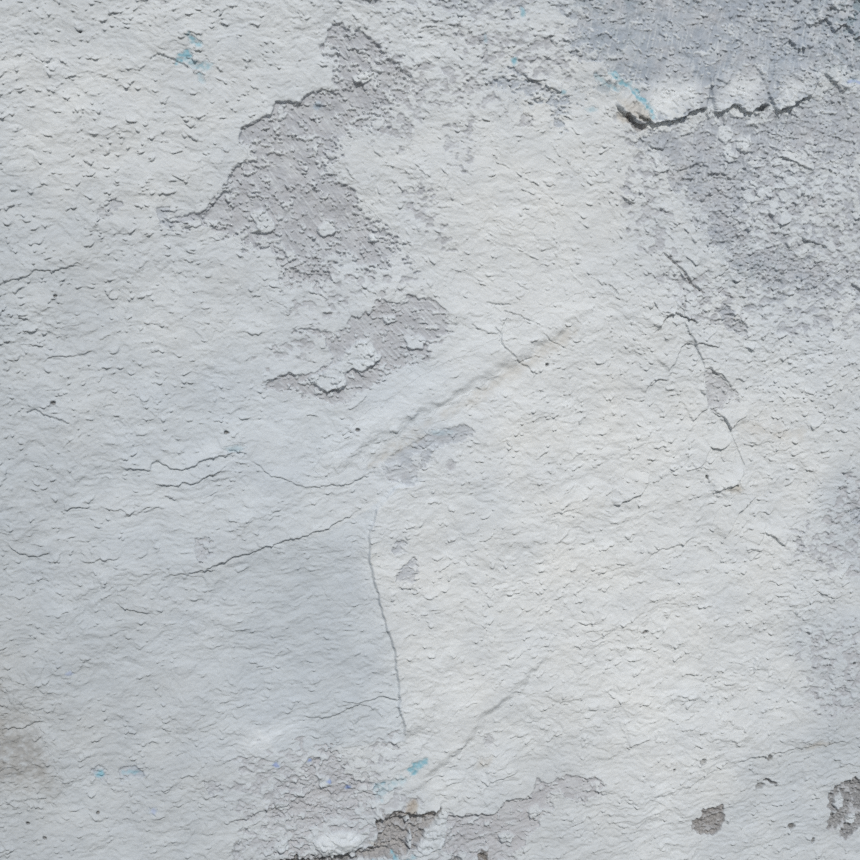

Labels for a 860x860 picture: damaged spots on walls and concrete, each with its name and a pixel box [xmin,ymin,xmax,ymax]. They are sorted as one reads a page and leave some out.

peeling [156,19,417,289]
peeling [549,0,860,291]
peeling [262,295,455,407]
crack [655,254,745,493]
peeling [232,744,604,860]
spalling [691,804,725,835]
spalling [826,777,860,840]